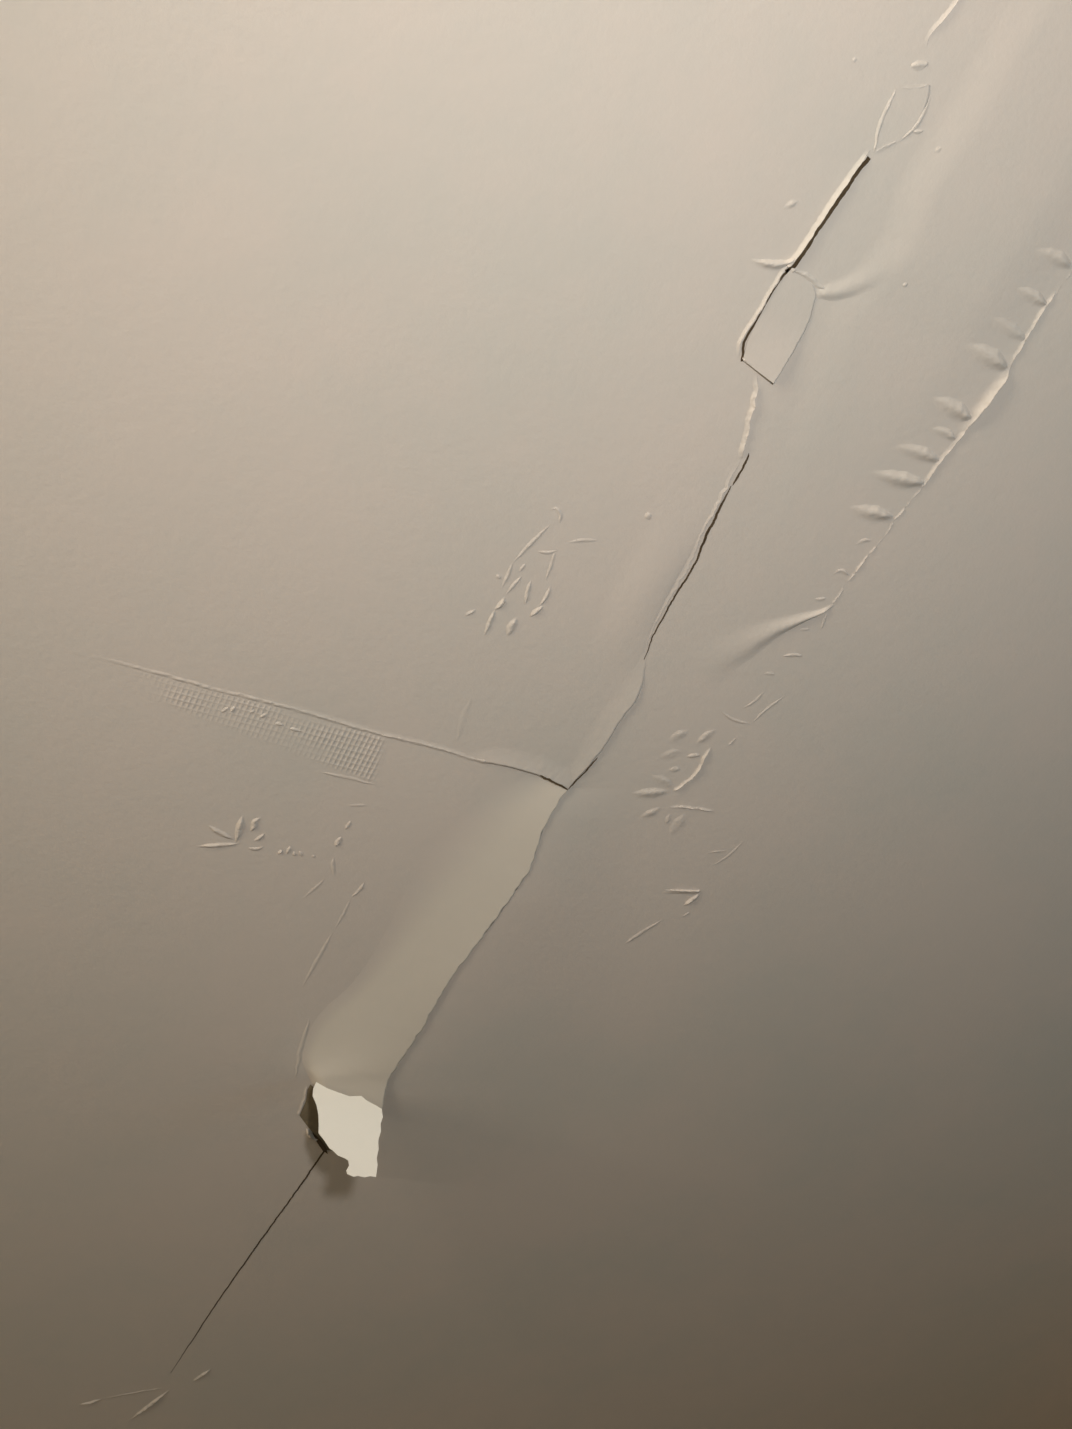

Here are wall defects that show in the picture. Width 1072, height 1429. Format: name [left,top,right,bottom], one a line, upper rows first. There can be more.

crack [923,0,959,47]
peeling [742,268,825,383]
crack [70,148,870,790]
crack [171,1151,324,1372]